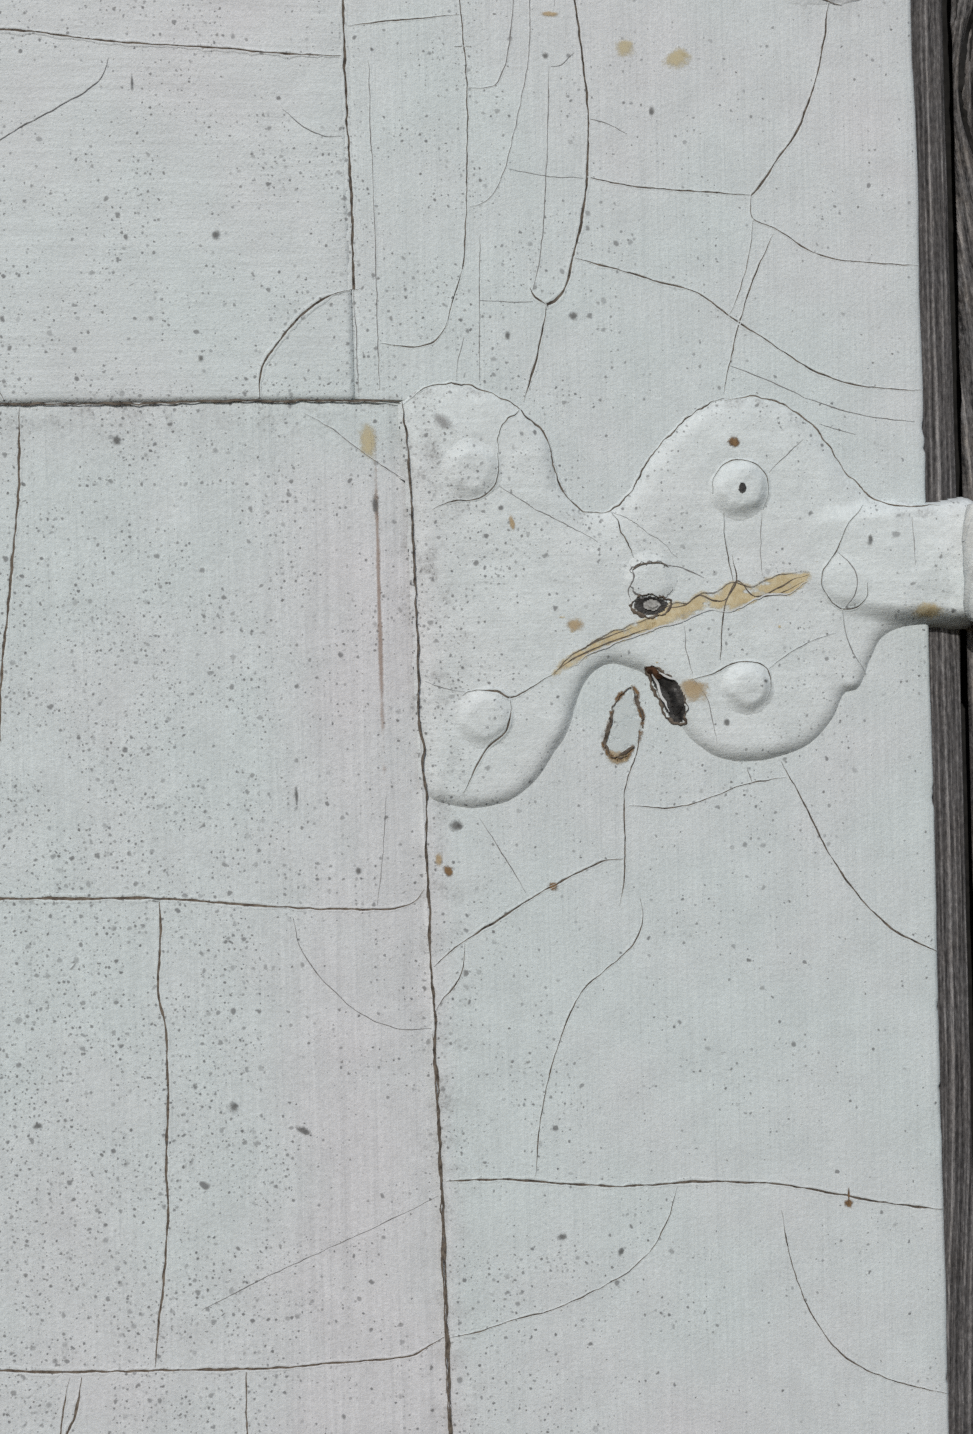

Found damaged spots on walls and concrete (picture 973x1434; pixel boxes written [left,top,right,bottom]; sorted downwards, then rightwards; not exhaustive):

crack [0,0,532,765]
crack [0,380,948,1434]
peeling [554,555,809,674]
crack [523,0,922,420]